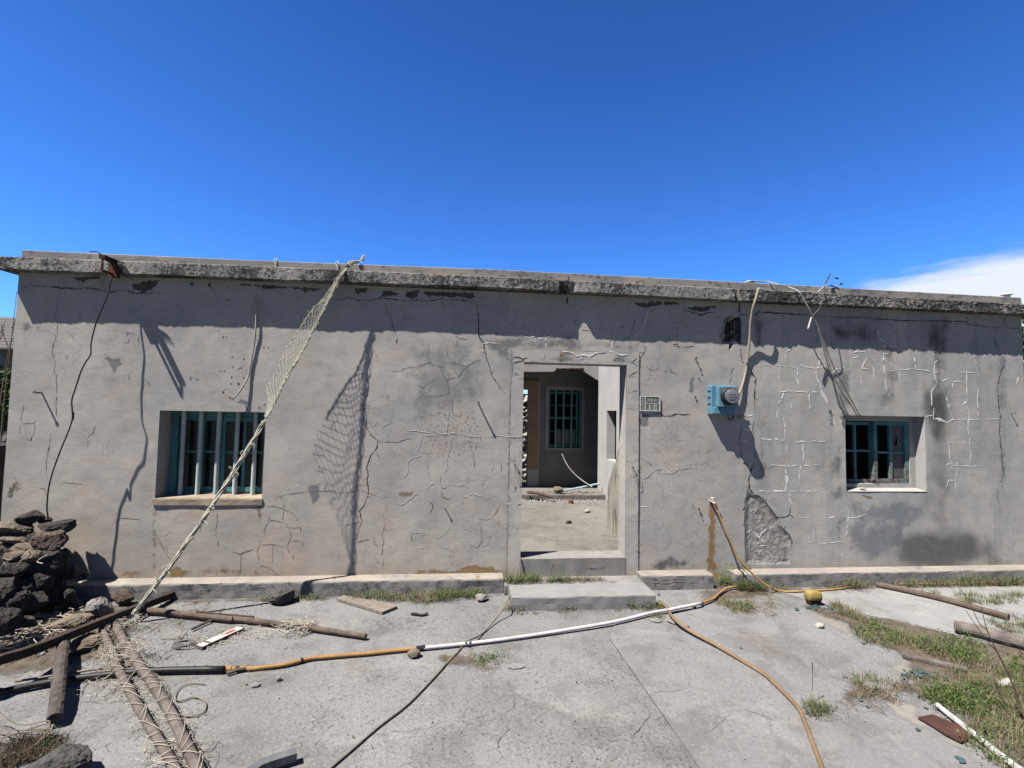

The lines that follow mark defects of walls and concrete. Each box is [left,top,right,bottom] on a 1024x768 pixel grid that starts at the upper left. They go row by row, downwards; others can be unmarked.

peeling [132,280,159,292]
crack [214,378,415,575]
peeling [380,290,475,299]
crack [337,274,546,549]
crack [624,321,693,552]
peeling [635,301,716,316]
corrosion [707,504,718,579]
flaking render [744,491,793,566]
water stain [744,329,997,566]
crack [728,283,1019,511]